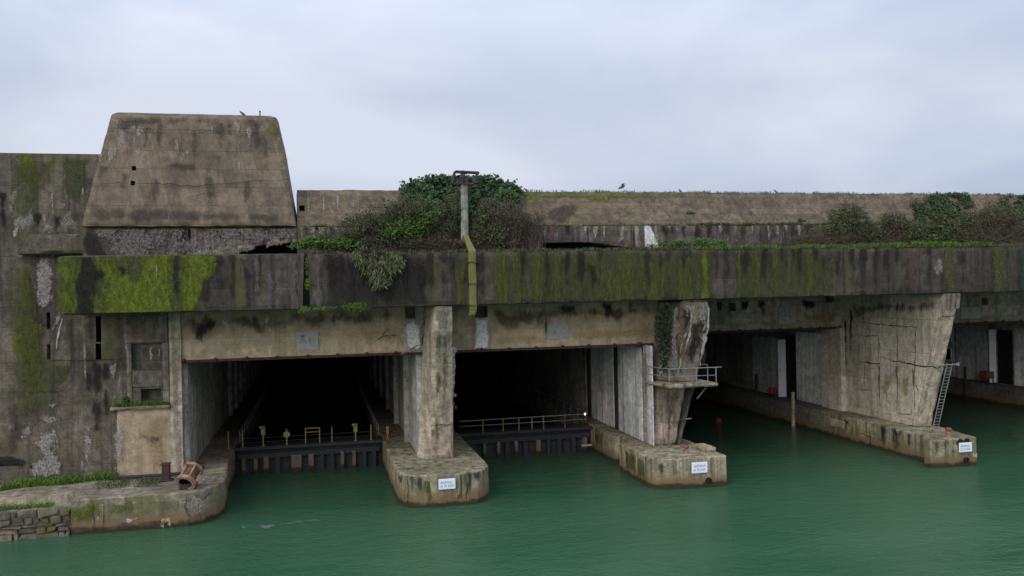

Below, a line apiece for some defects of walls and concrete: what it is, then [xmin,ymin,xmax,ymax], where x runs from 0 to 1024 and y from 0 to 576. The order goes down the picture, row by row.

damp [98,118,172,172]
damp [186,252,461,341]
damp [479,250,707,372]
crack [838,253,946,447]